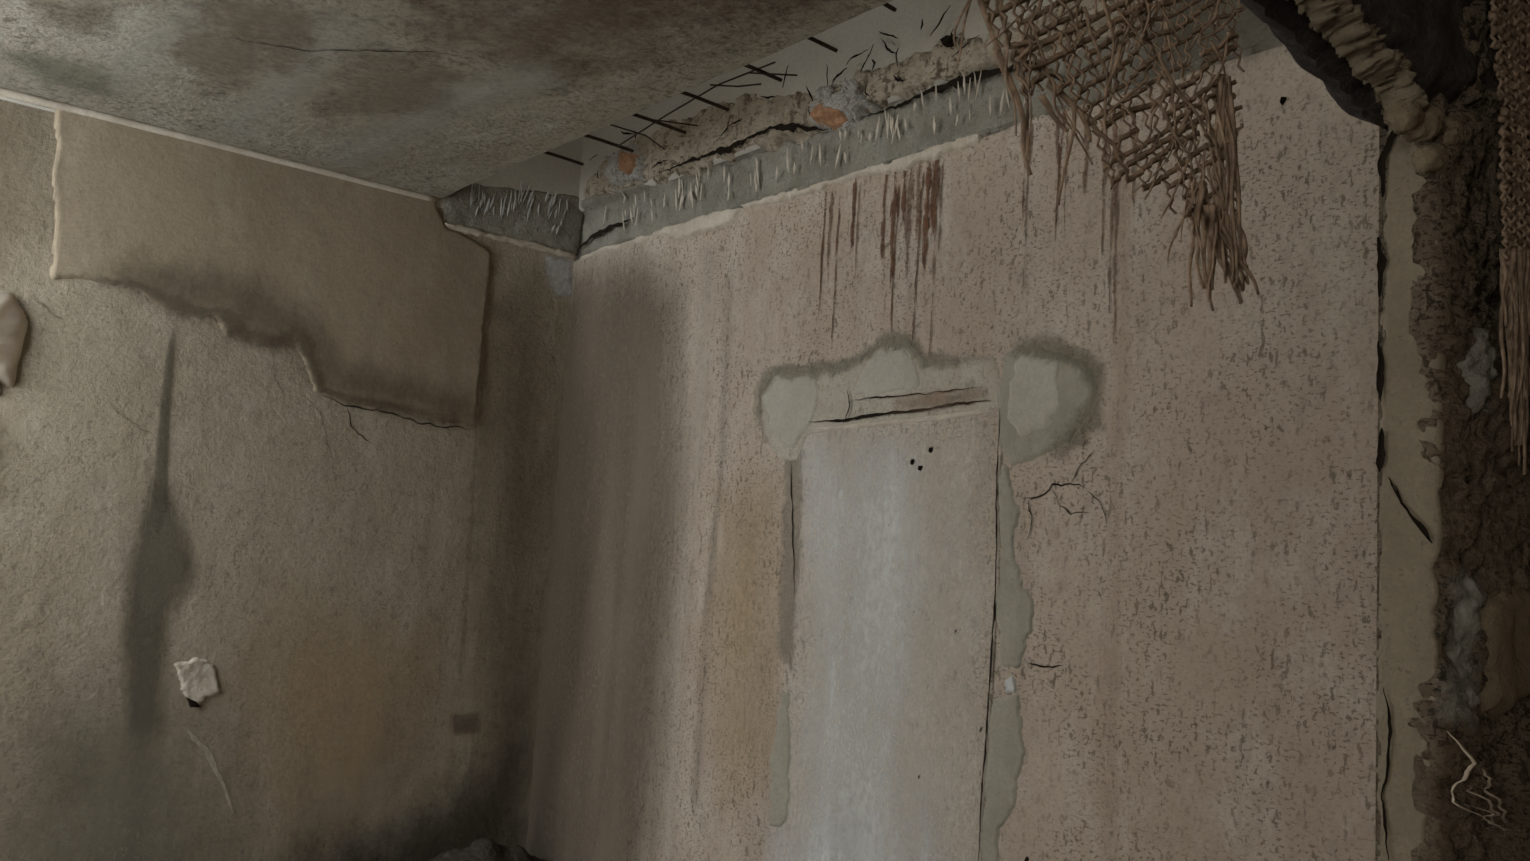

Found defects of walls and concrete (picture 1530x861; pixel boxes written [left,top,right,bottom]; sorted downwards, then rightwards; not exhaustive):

crack [1377,130,1397,197]
water stain [115,271,461,417]
rust [818,178,860,333]
rust [880,159,944,356]
crack [1377,237,1387,298]
flaking render [1027,0,1507,861]
crack [1376,341,1432,543]
water stain [128,333,190,748]
flaking render [1476,584,1530,720]